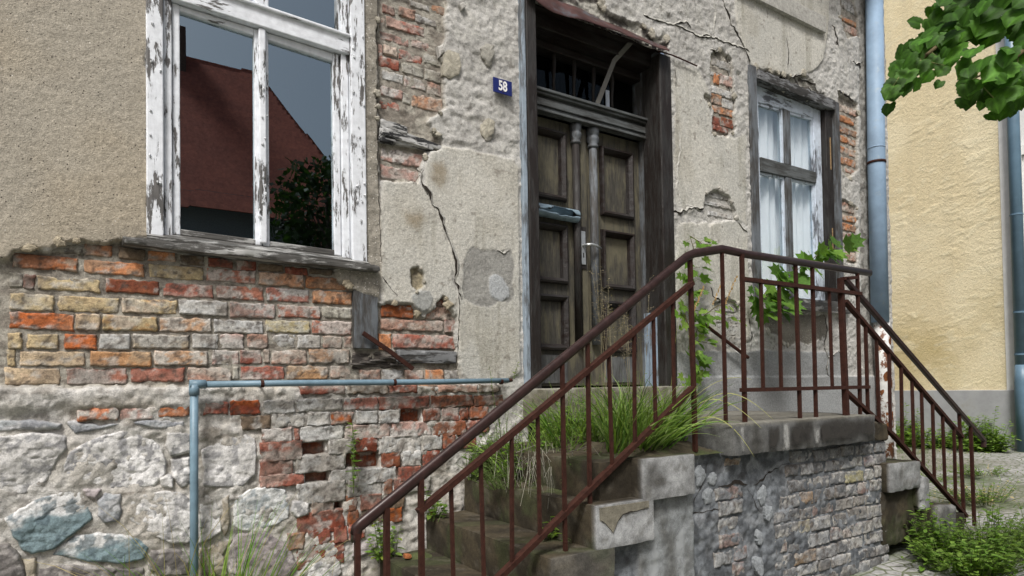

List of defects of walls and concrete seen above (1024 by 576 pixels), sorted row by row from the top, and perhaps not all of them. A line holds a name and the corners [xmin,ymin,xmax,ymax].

flaking render [363,0,444,121]
crack [643,0,751,113]
flaking render [708,47,738,136]
flaking render [380,147,428,182]
crack [414,167,463,368]
crack [674,132,704,215]
flaking render [704,186,739,220]
flaking render [839,92,861,181]
flaking render [842,200,859,262]
flaking render [4,236,504,570]
spalling [599,501,649,532]